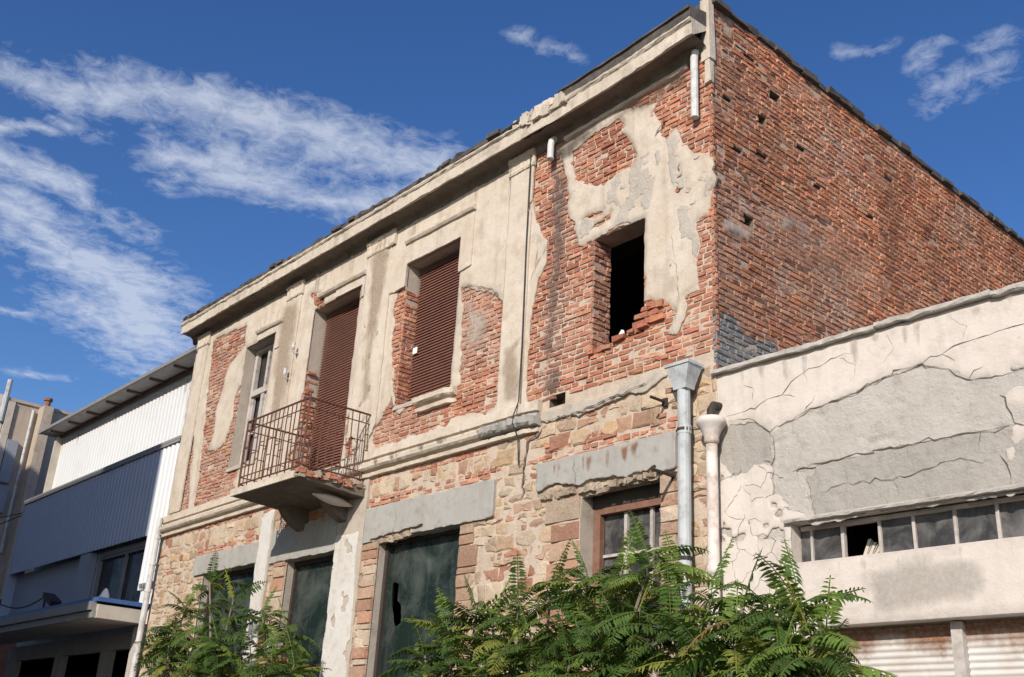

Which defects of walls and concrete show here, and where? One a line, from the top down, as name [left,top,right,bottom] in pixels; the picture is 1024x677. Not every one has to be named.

spalling [508,91,569,141]
spalling [527,60,753,408]
spalling [180,326,248,511]
spalling [373,279,503,448]
spalling [718,365,1024,526]
crack [722,318,1024,614]